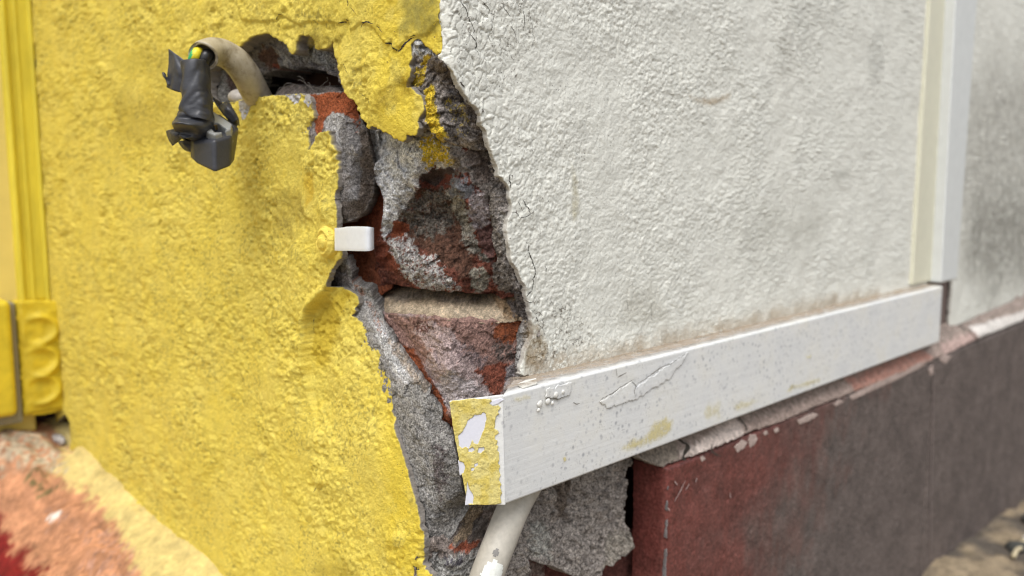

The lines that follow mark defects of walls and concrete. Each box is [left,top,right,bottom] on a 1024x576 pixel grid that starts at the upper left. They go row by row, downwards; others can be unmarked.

spalling [216,68,250,120]
spalling [411,39,487,151]
spalling [247,37,380,223]
spalling [488,164,540,389]
peeling [599,352,689,408]
spalling [834,354,952,407]
spalling [331,254,504,576]
spalling [734,427,779,452]
spalling [797,413,818,425]